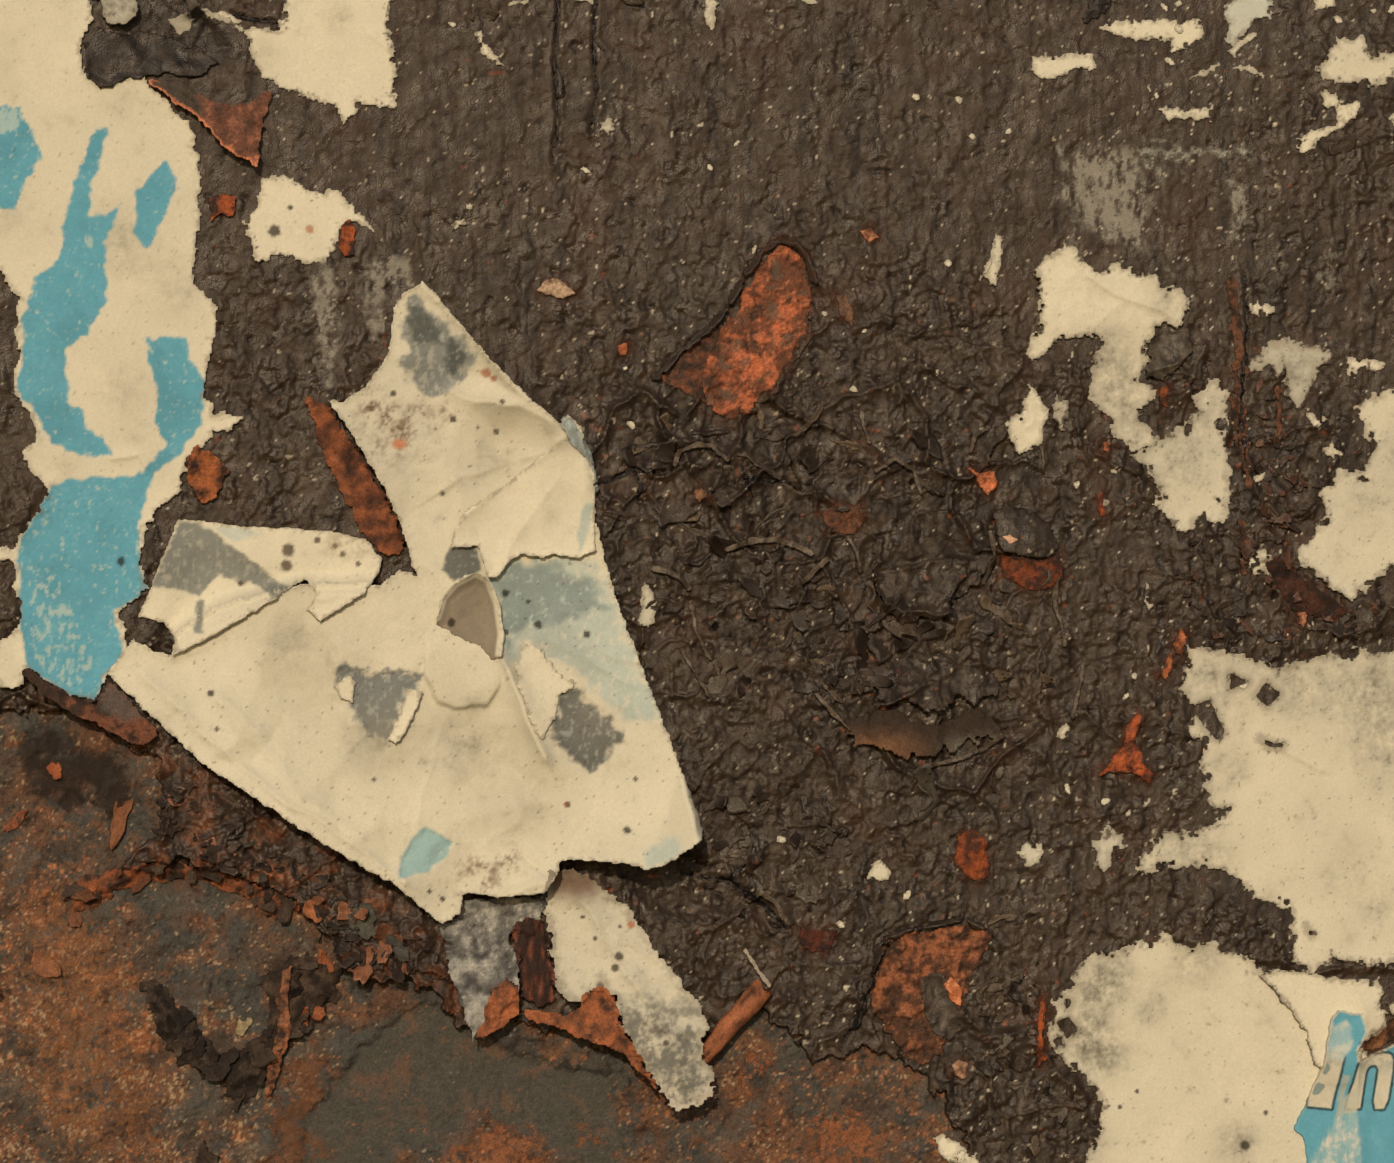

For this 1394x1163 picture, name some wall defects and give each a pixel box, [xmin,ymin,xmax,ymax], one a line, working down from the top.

rust [149,79,272,167]
rust [649,236,819,428]
peeling [1145,328,1193,381]
crack [593,466,666,500]
crack [710,474,814,502]
peeling [1169,377,1394,654]
rust [21,732,136,850]
rust [61,853,322,923]
peeling [151,780,447,985]
crack [680,864,786,930]
rust [139,950,345,1111]
rust [849,912,994,1079]